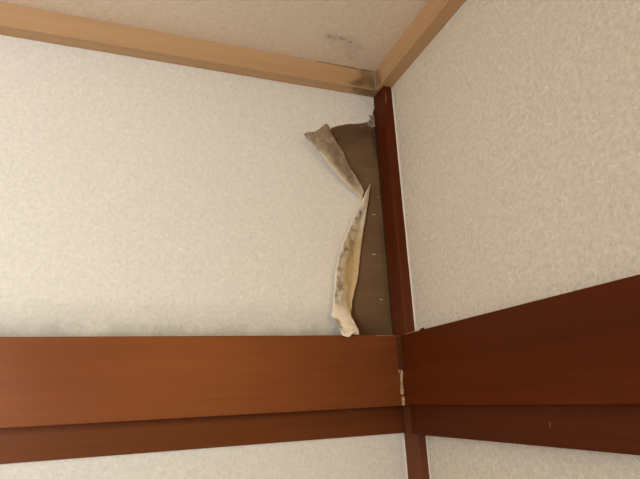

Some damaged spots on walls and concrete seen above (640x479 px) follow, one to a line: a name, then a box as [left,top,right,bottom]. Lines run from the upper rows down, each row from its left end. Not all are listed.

damp [340,240,361,312]